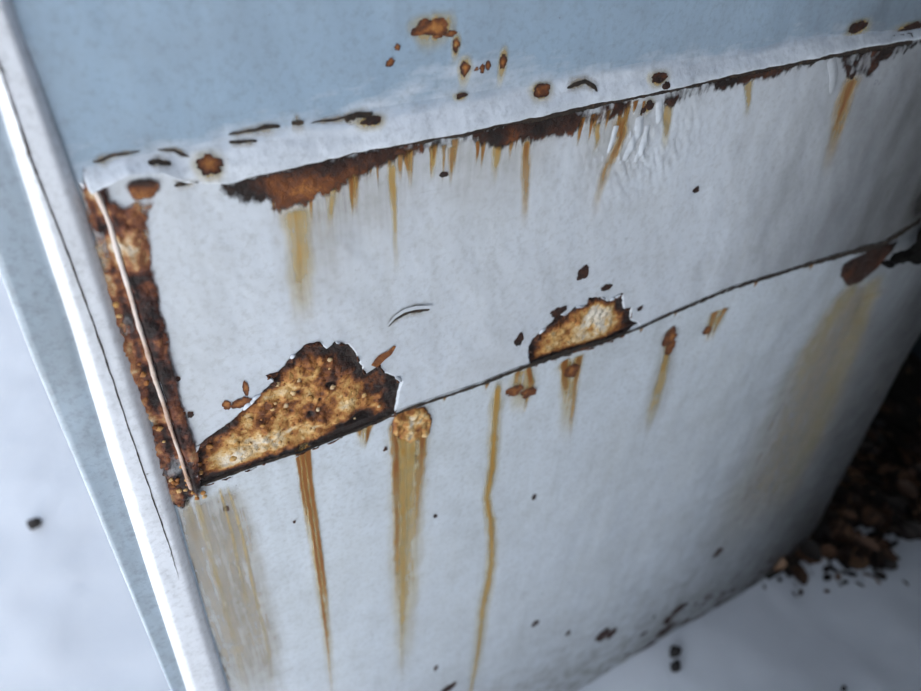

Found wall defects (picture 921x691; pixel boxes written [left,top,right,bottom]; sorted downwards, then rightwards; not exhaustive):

peeling [897,21,921,32]
corrosion [664,63,814,134]
corrosion [833,41,921,138]
corrosion [222,100,645,283]
spalling [514,284,643,367]
corrosion [83,171,271,679]
spalling [195,341,402,486]
corrosion [295,445,329,659]
corrosion [390,407,432,624]
peeling [595,627,617,642]
peeling [624,588,735,657]